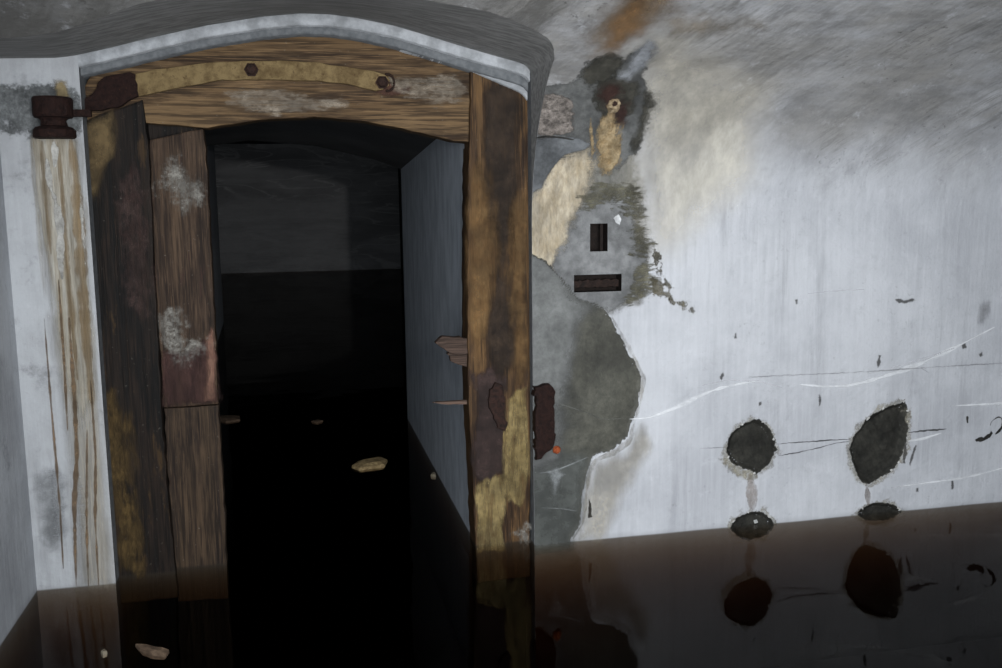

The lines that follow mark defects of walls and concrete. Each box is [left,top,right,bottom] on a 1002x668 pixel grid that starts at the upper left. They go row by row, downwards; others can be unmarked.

flaking render [532,42,656,276]
corrosion [599,0,669,46]
corrosion [31,137,107,586]
peeling [532,254,641,553]